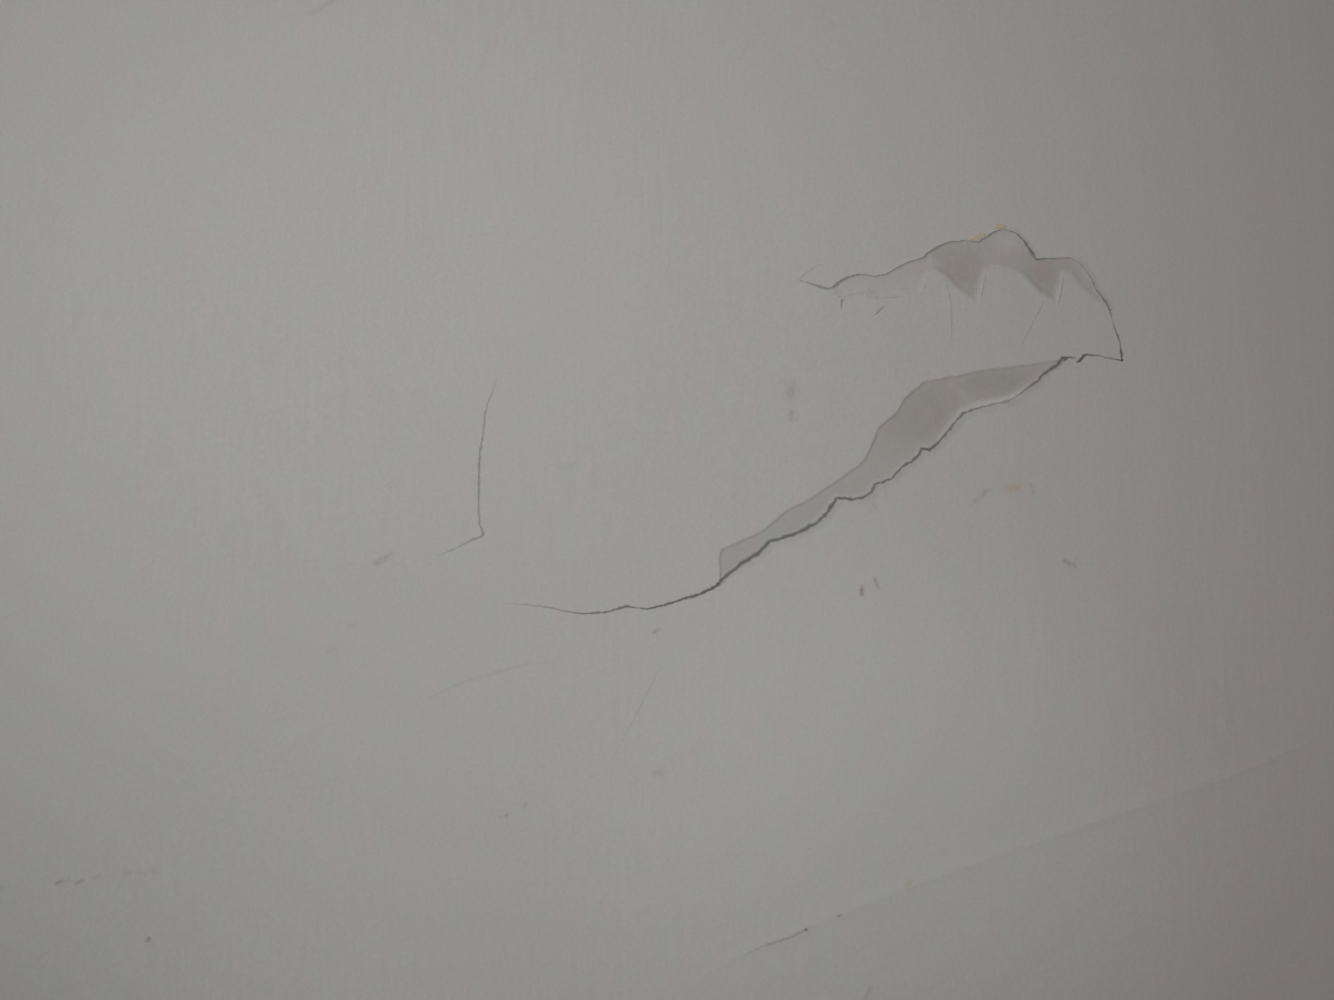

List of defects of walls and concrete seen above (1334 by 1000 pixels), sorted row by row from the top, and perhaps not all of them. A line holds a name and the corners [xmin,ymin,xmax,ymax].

peeling [799,224,1114,310]
peeling [718,357,1065,585]
crack [603,582,720,613]